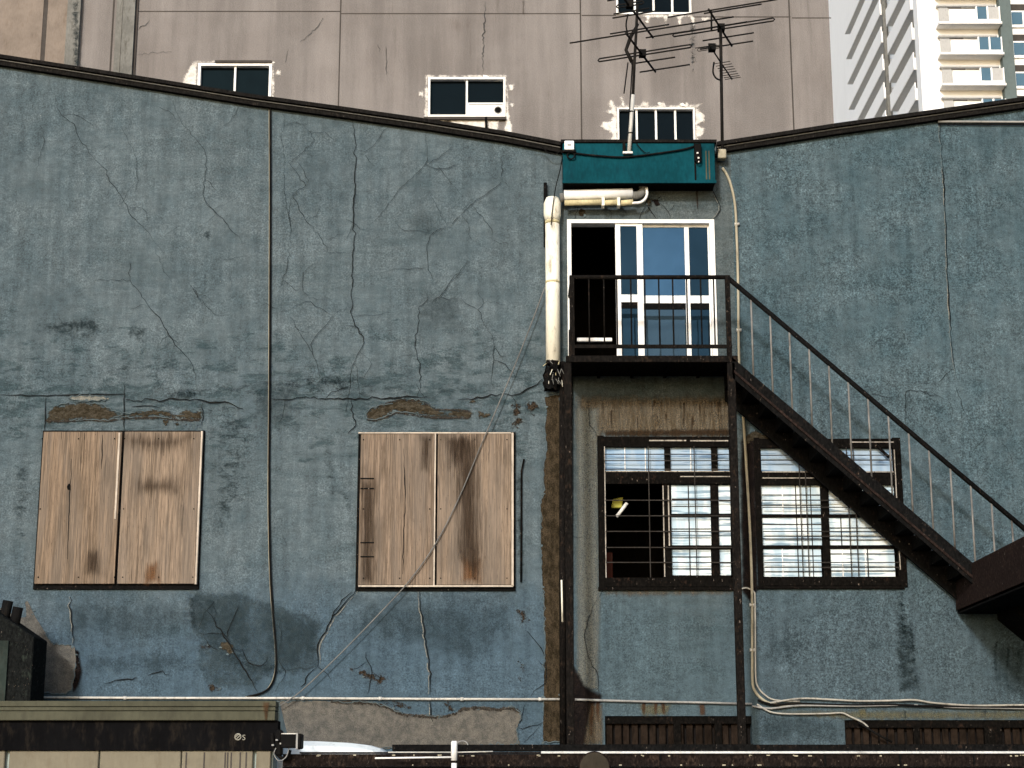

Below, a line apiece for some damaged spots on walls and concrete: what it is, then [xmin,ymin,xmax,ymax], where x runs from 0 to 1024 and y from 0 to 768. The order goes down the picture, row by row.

crack [36,77,252,316]
crack [261,116,544,433]
crack [873,140,964,423]
crack [0,265,243,431]
peeling [46,394,202,426]
peeling [366,398,490,421]
leakage [566,397,729,745]
peeling [0,601,78,695]
crack [197,591,380,692]
crack [418,596,433,721]
peeling [277,700,522,766]